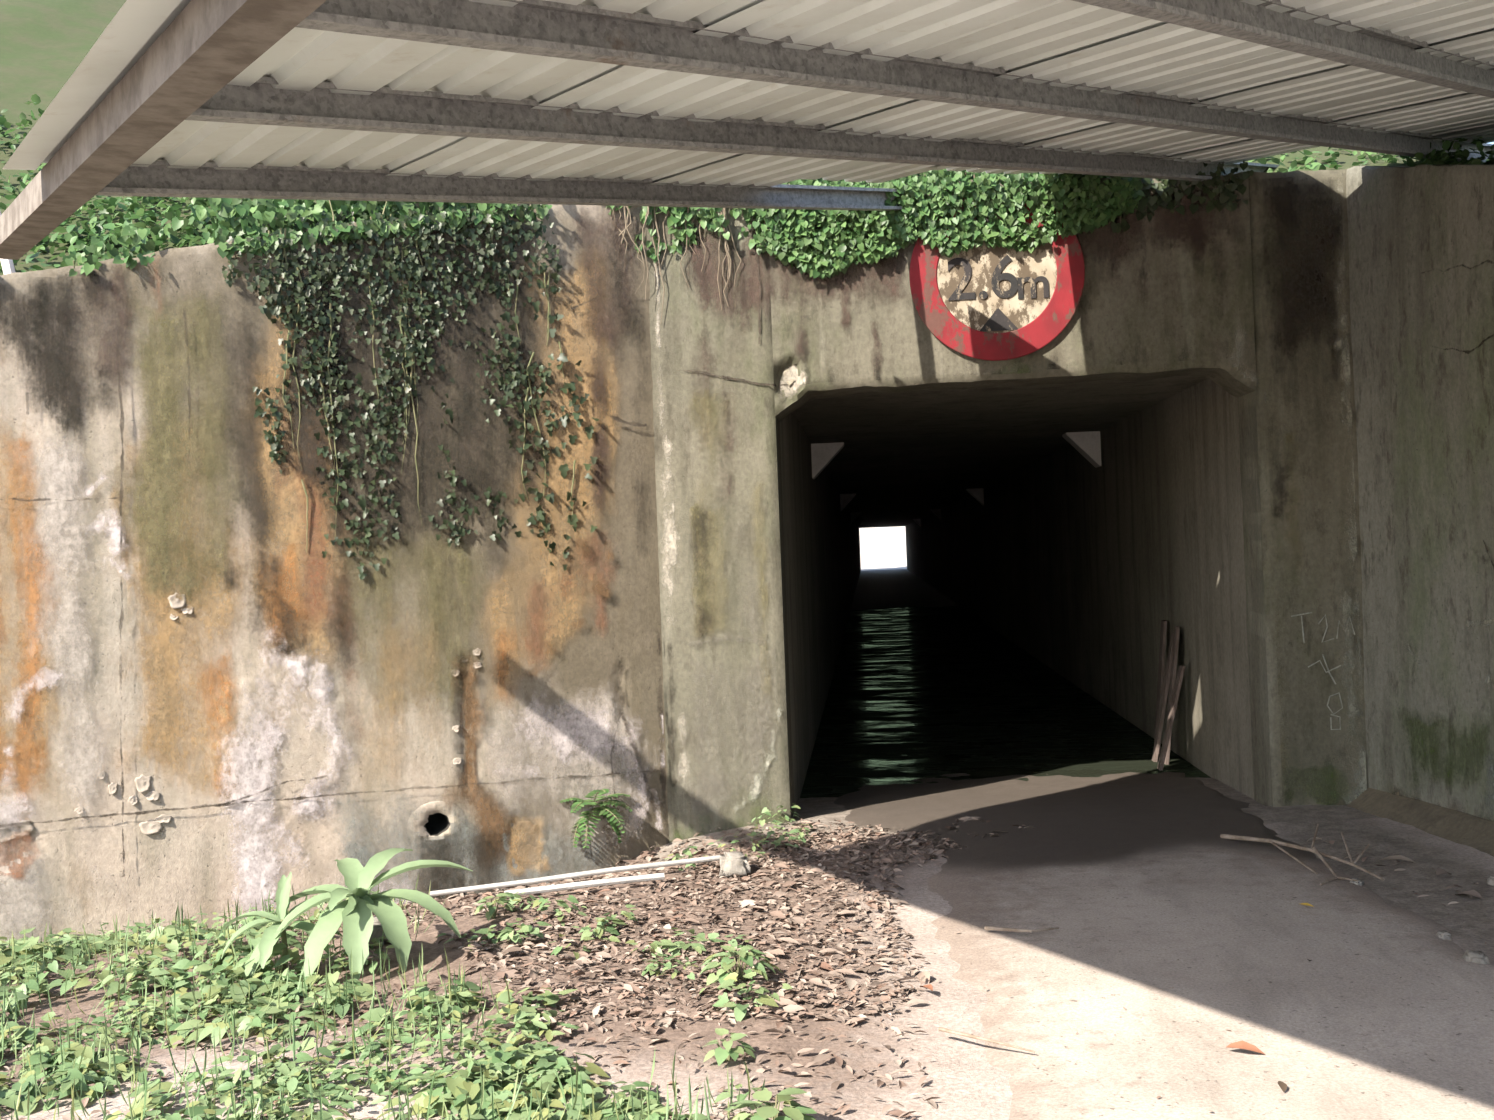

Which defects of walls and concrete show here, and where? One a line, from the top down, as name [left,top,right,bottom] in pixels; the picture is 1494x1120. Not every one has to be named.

rust [0,442,58,787]
water stain [0,270,176,803]
rust [136,427,239,793]
rust [250,309,352,657]
water stain [200,327,648,919]
rust [487,258,617,687]
water stain [577,217,660,344]
water stain [1265,178,1352,423]
water stain [0,796,27,828]
peeling [0,820,35,878]